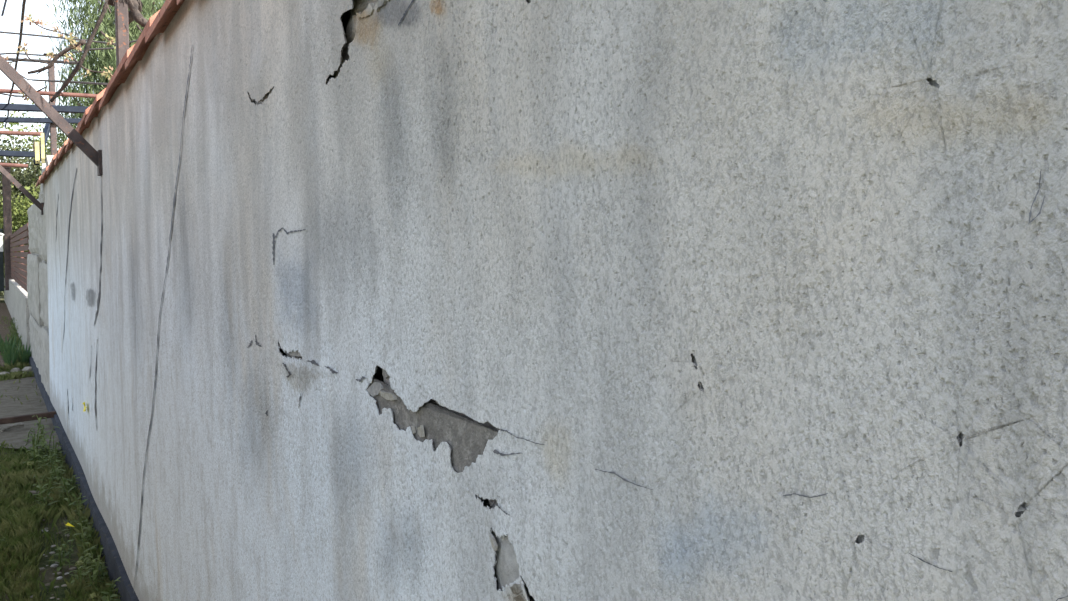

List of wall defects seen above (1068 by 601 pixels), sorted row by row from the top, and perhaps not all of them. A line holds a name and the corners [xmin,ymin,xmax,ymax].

crack [335,0,414,78]
crack [133,45,193,593]
crack [247,335,338,408]
spalling [356,369,544,473]